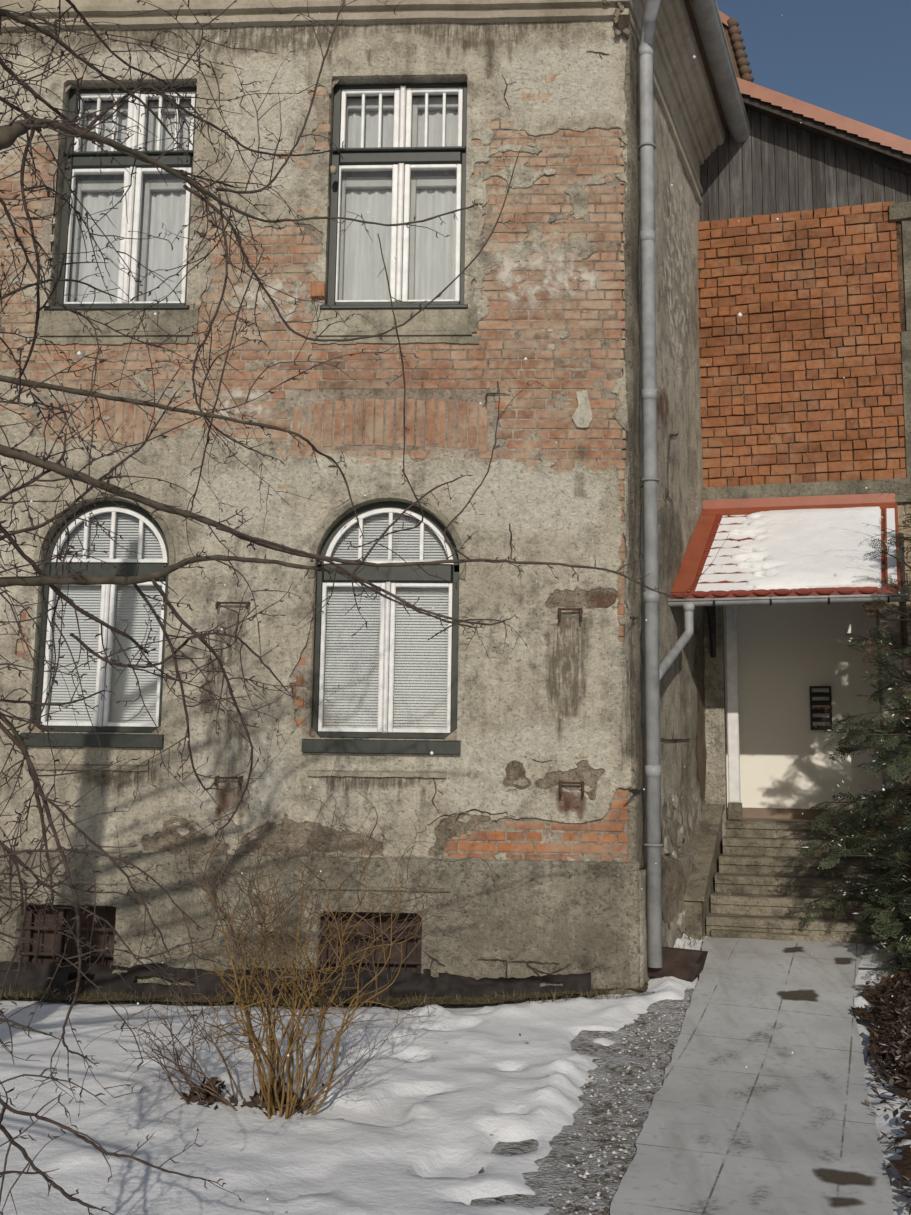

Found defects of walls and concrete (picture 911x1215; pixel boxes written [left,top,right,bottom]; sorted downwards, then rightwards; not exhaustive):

leakage [1,24,377,62]
leakage [395,21,567,74]
flaking render [278,85,332,168]
flaking render [0,113,629,661]
leakage [546,615,586,733]
peeling [502,751,605,800]
peeling [138,814,384,856]
flaking render [428,788,629,862]